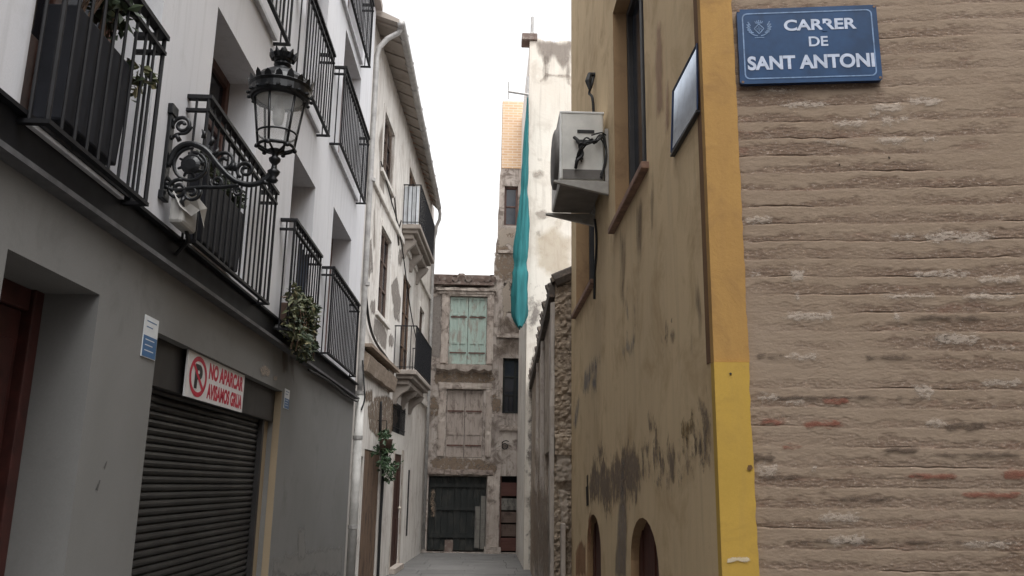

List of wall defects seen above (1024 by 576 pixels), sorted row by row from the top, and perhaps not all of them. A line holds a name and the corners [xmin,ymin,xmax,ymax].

damp [538,42,571,78]
spalling [494,233,514,320]
peeling [430,295,495,416]
peeling [366,389,397,453]
peeling [430,456,497,475]
peeling [527,417,572,571]
peeling [589,418,688,517]
peeling [681,405,709,461]